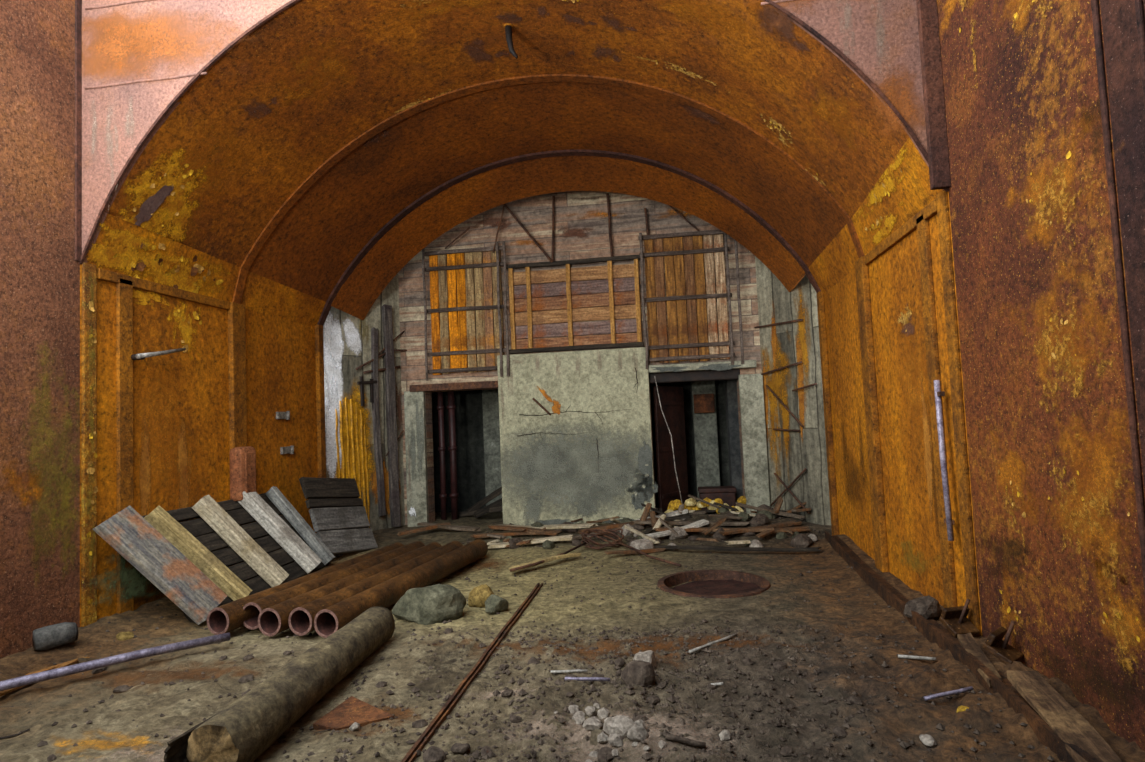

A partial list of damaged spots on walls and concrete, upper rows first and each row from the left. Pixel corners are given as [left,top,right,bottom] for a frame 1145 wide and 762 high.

rust [88,17,208,75]
rust [946,0,976,86]
rust [1012,0,1052,28]
rust [1026,151,1095,244]
peeling [86,149,229,358]
rust [762,292,809,475]
rust [1034,296,1112,412]
rust [905,357,933,518]
rust [997,454,1036,547]
rust [1048,427,1142,673]
rust [996,576,1023,634]